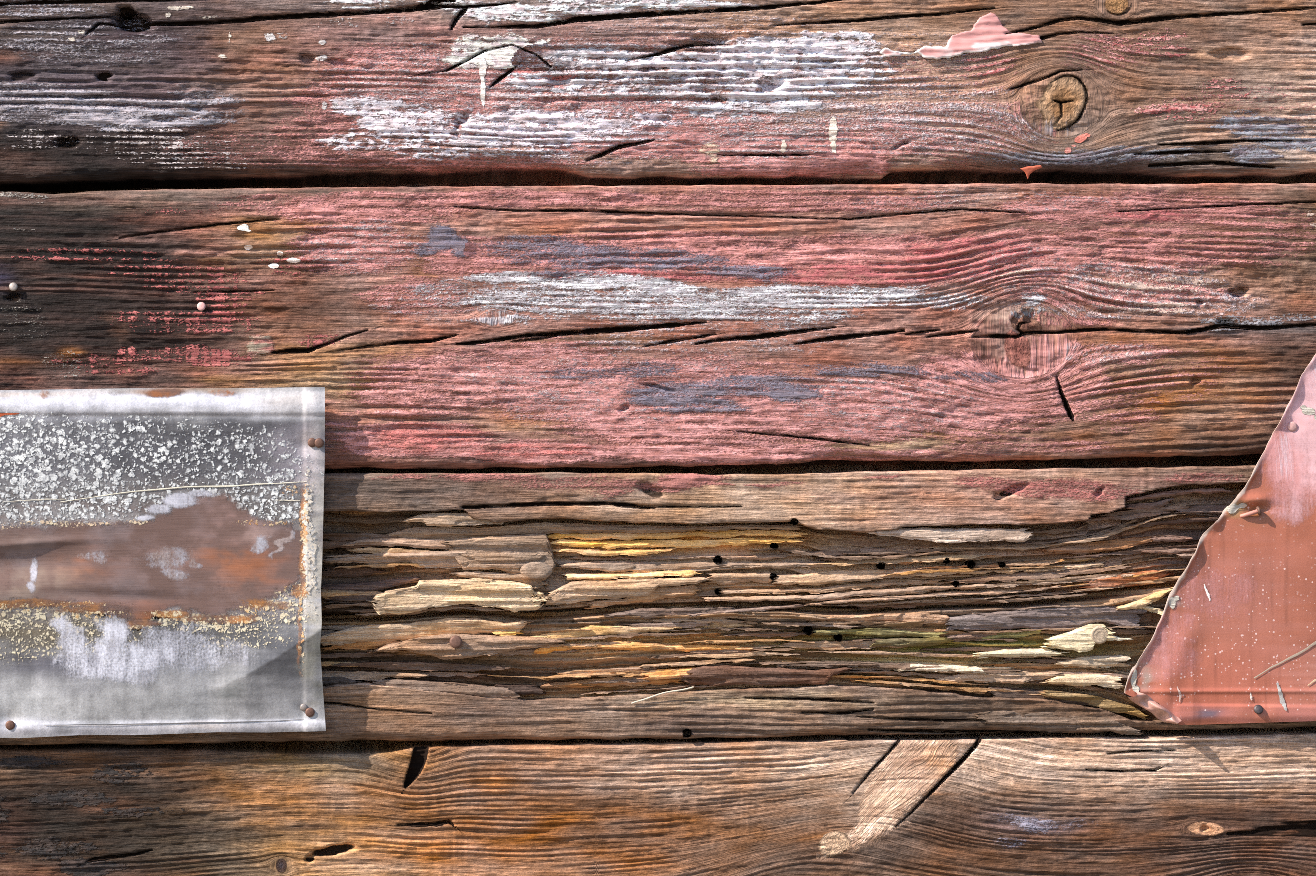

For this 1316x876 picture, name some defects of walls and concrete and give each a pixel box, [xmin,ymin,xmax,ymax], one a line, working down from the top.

crack [0,0,1316,90]
crack [1010,69,1087,131]
peeling [11,0,1316,502]
crack [271,322,1316,353]
corrosion [147,389,182,397]
corrosion [0,411,323,663]
peeling [1131,669,1140,692]
crack [745,697,1057,830]